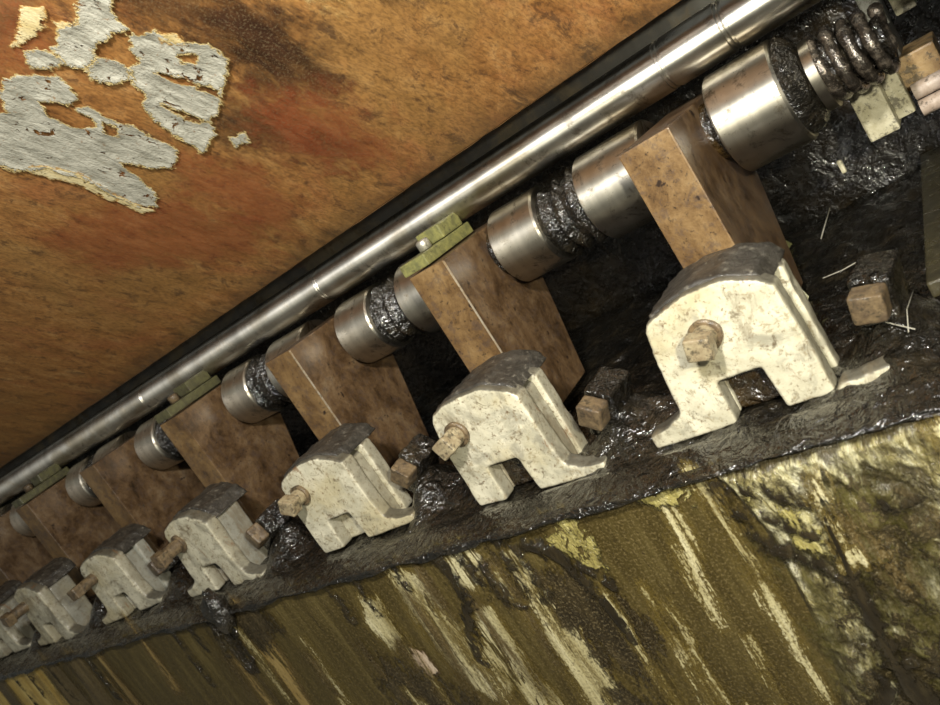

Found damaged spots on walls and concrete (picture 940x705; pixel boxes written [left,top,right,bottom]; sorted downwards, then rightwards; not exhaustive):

corrosion [134,0,328,87]
peeling [0,0,252,214]
corrosion [227,111,335,154]
leakage [0,680,22,705]
leakage [36,644,139,705]
leakage [231,625,310,705]
leakage [297,634,352,705]
leakage [356,548,621,705]
leakage [596,579,731,705]
leakage [660,480,838,705]